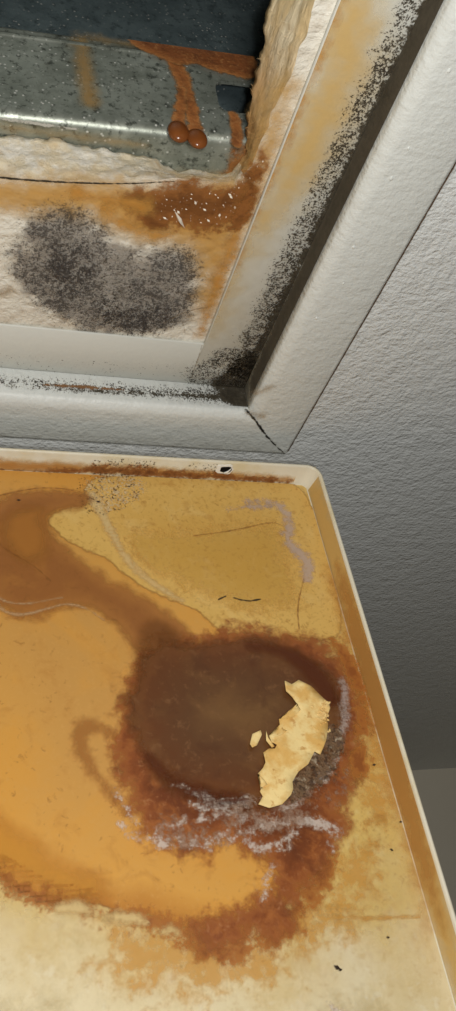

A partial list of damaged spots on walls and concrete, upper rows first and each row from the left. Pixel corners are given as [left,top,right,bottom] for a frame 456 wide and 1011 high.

rust [128,39,258,149]
water stain [0,0,444,407]
water stain [0,470,219,644]
water stain [0,599,418,960]
peeling [250,680,331,808]